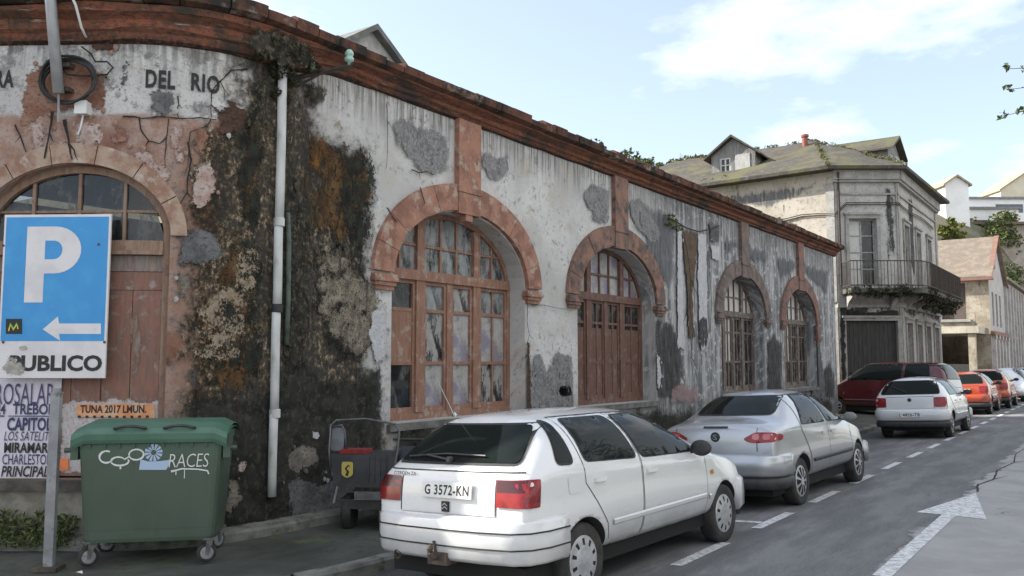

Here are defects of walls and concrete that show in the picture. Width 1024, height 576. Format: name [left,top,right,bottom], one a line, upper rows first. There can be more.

crack [14,111,78,160]
flaking render [20,58,248,208]
crack [122,68,249,204]
flaking render [389,114,452,177]
flaking render [482,152,523,183]
flaking render [582,183,612,225]
flaking render [629,198,661,241]
flaking render [174,228,225,302]
leakage [182,26,432,527]
flaking render [526,342,576,409]
leakage [636,300,693,430]